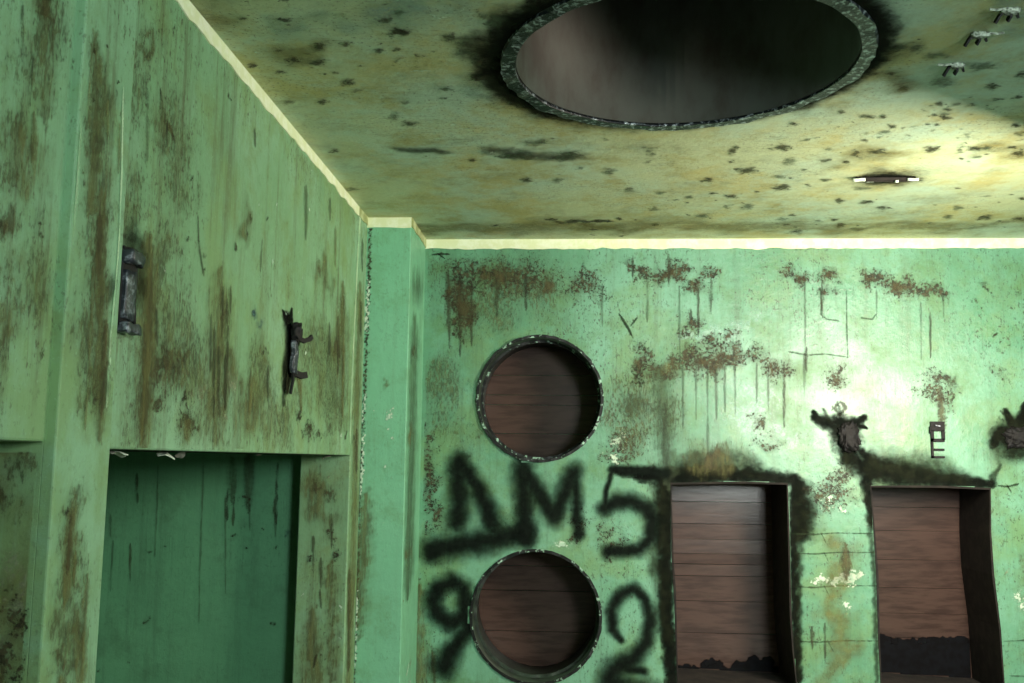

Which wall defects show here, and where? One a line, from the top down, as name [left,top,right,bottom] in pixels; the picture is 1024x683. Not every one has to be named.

rust [0,208,22,239]
rust [63,497,76,604]
rust [82,189,108,444]
rust [135,233,189,448]
rust [177,223,237,448]
rust [302,470,339,607]
water stain [405,337,459,683]
water stain [600,367,684,489]